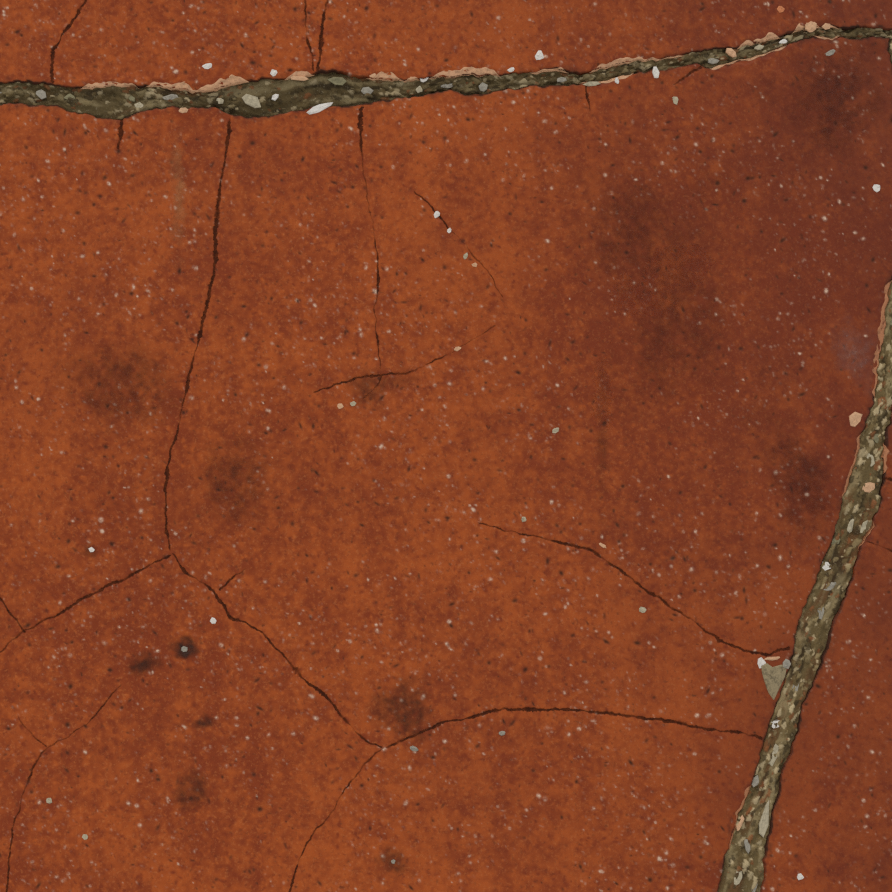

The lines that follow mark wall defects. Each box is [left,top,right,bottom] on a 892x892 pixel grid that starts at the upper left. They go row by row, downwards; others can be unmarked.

crack [0,0,892,409]
crack [0,280,892,892]